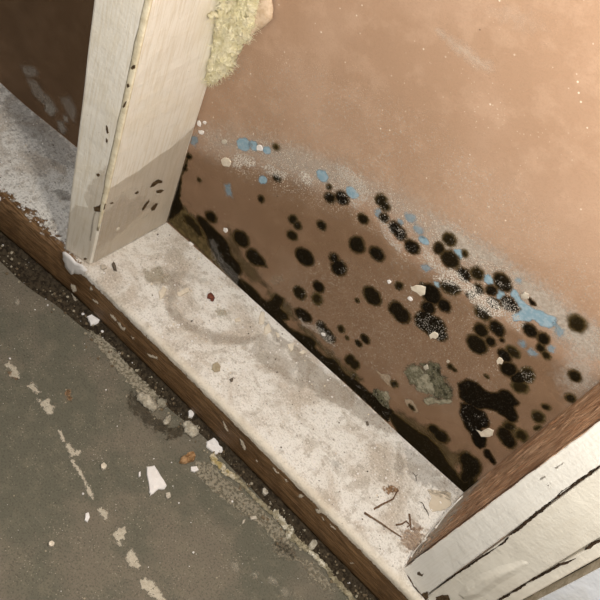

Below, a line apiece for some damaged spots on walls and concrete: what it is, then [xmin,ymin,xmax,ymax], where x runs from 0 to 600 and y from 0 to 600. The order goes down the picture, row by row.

damp [198,120,594,394]
damp [167,153,497,492]
damp [496,403,551,449]
crack [438,465,600,588]
crack [499,539,600,600]